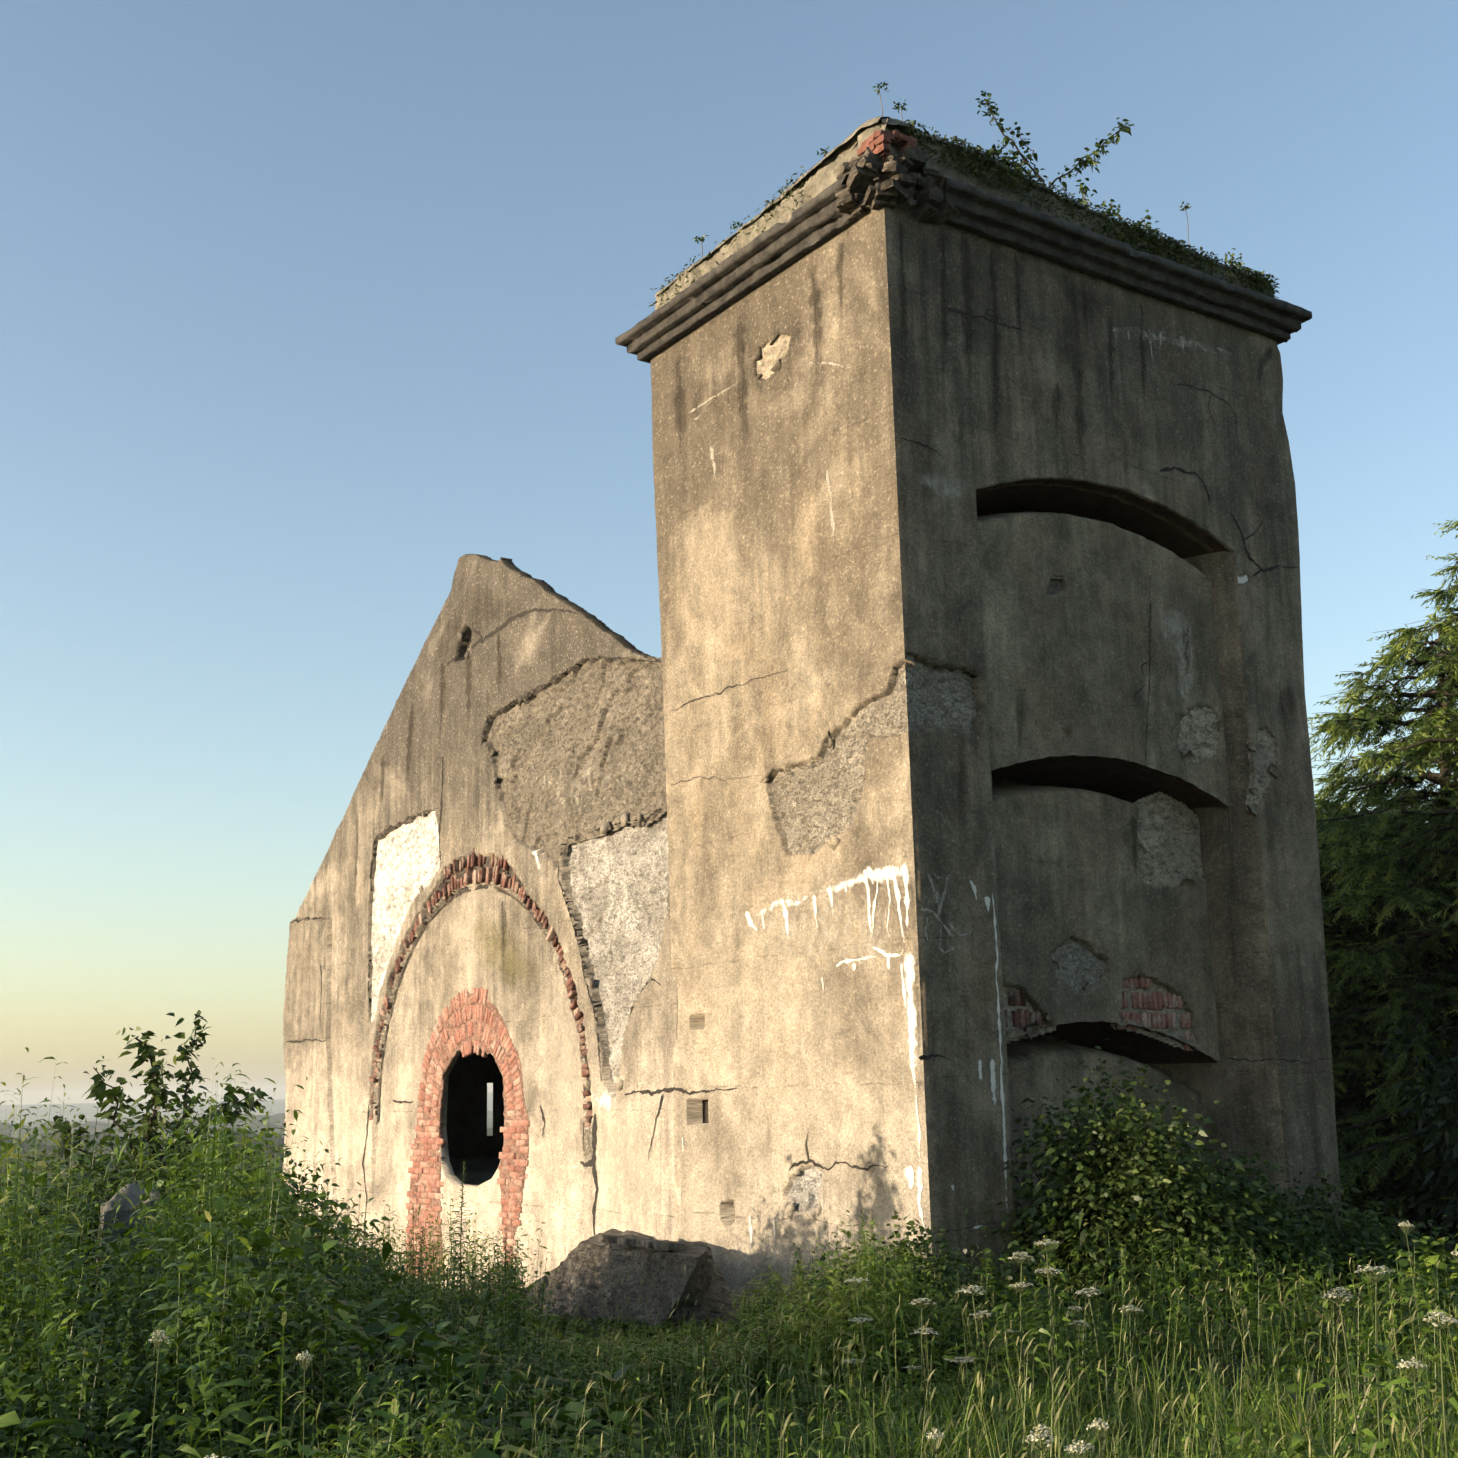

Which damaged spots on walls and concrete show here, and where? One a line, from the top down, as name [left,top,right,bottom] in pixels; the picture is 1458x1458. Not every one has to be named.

peeling [749,332,791,380]
crack [1159,467,1298,577]
spalling [760,655,977,856]
peeling [371,811,441,1022]
spalling [487,656,669,1091]
peeling [1134,792,1204,889]
leakage [745,863,971,1240]
efflorescence [970,880,1008,1213]
spalling [1110,976,1199,1051]
leakage [748,1216,795,1248]
spalling [785,1167,823,1220]
crack [788,1129,889,1171]